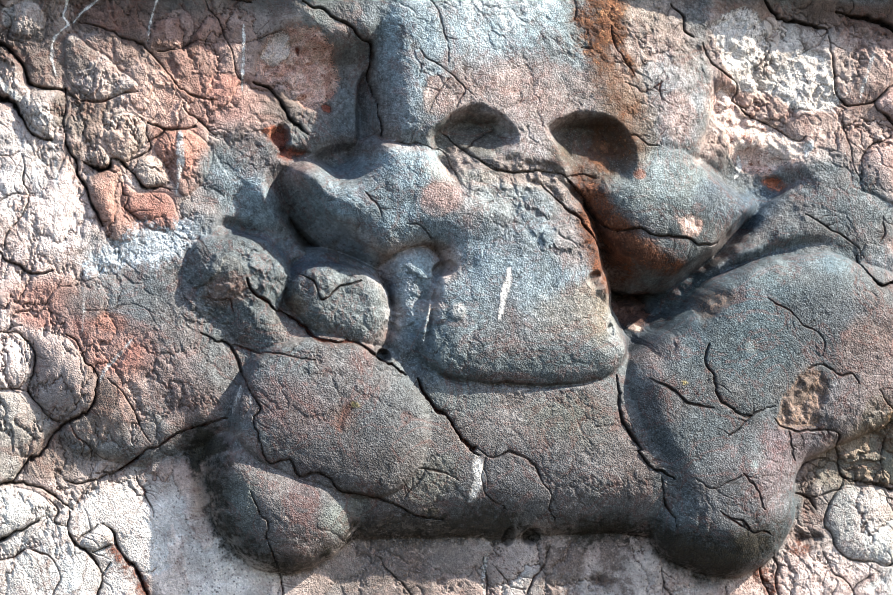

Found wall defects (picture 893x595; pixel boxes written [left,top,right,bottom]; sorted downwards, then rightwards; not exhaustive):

crack [0,44,39,88]
crack [0,96,34,136]
crack [255,84,302,131]
crack [833,72,893,127]
crack [65,136,156,227]
crack [556,173,689,248]
crack [0,359,110,502]
crack [228,345,275,393]
crack [287,315,392,365]
crack [419,386,476,454]
spalling [777,369,829,428]
crack [67,522,148,595]